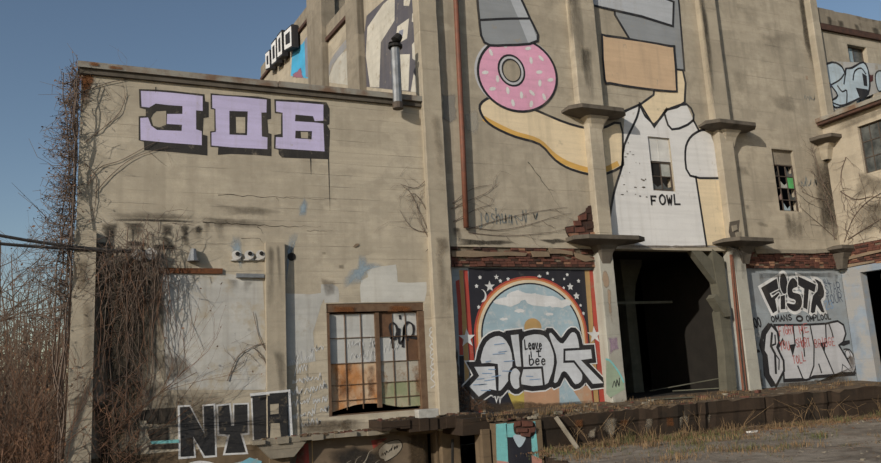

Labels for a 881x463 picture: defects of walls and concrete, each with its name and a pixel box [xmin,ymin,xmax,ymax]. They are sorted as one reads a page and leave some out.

spalling [565,205,595,237]
damp [127,228,174,249]